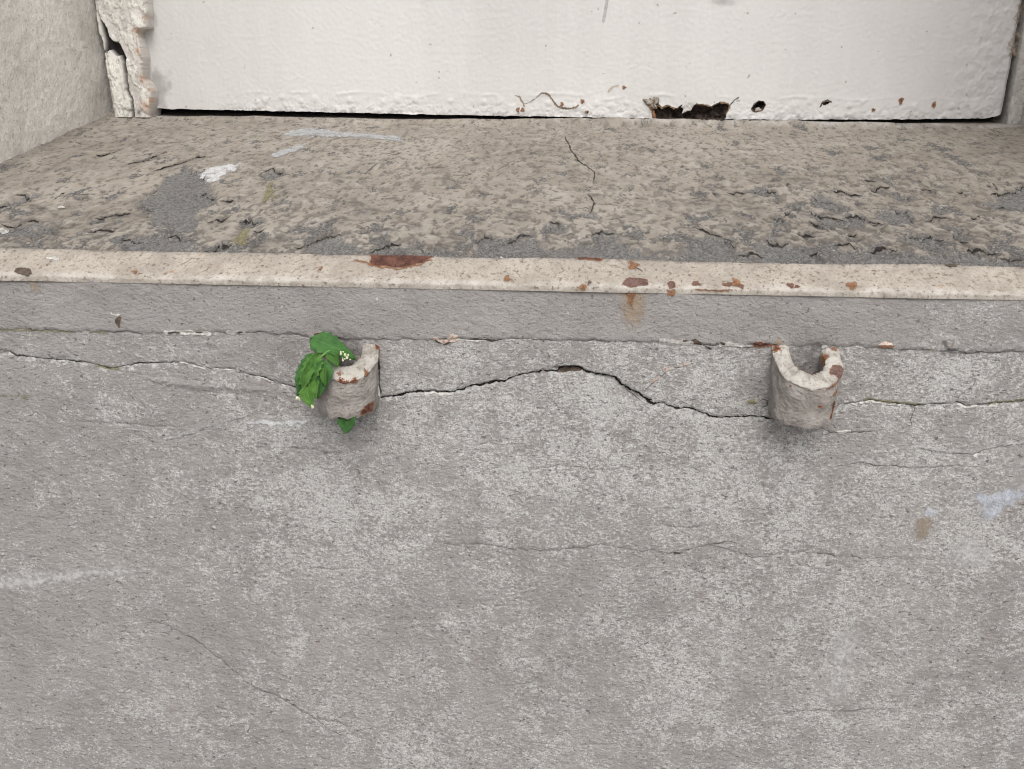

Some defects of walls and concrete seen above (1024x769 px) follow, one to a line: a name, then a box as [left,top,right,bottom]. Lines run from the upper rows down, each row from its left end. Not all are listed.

spalling [643,97,729,121]
spalling [259,168,285,181]
crack [565,136,595,213]
spalling [91,156,264,253]
spalling [295,180,1024,267]
corrosion [355,255,433,270]
corrosion [622,261,648,306]
corrosion [692,278,744,292]
crack [0,328,296,388]
crack [338,337,775,420]
corrosion [798,365,844,419]
crack [745,343,1015,354]